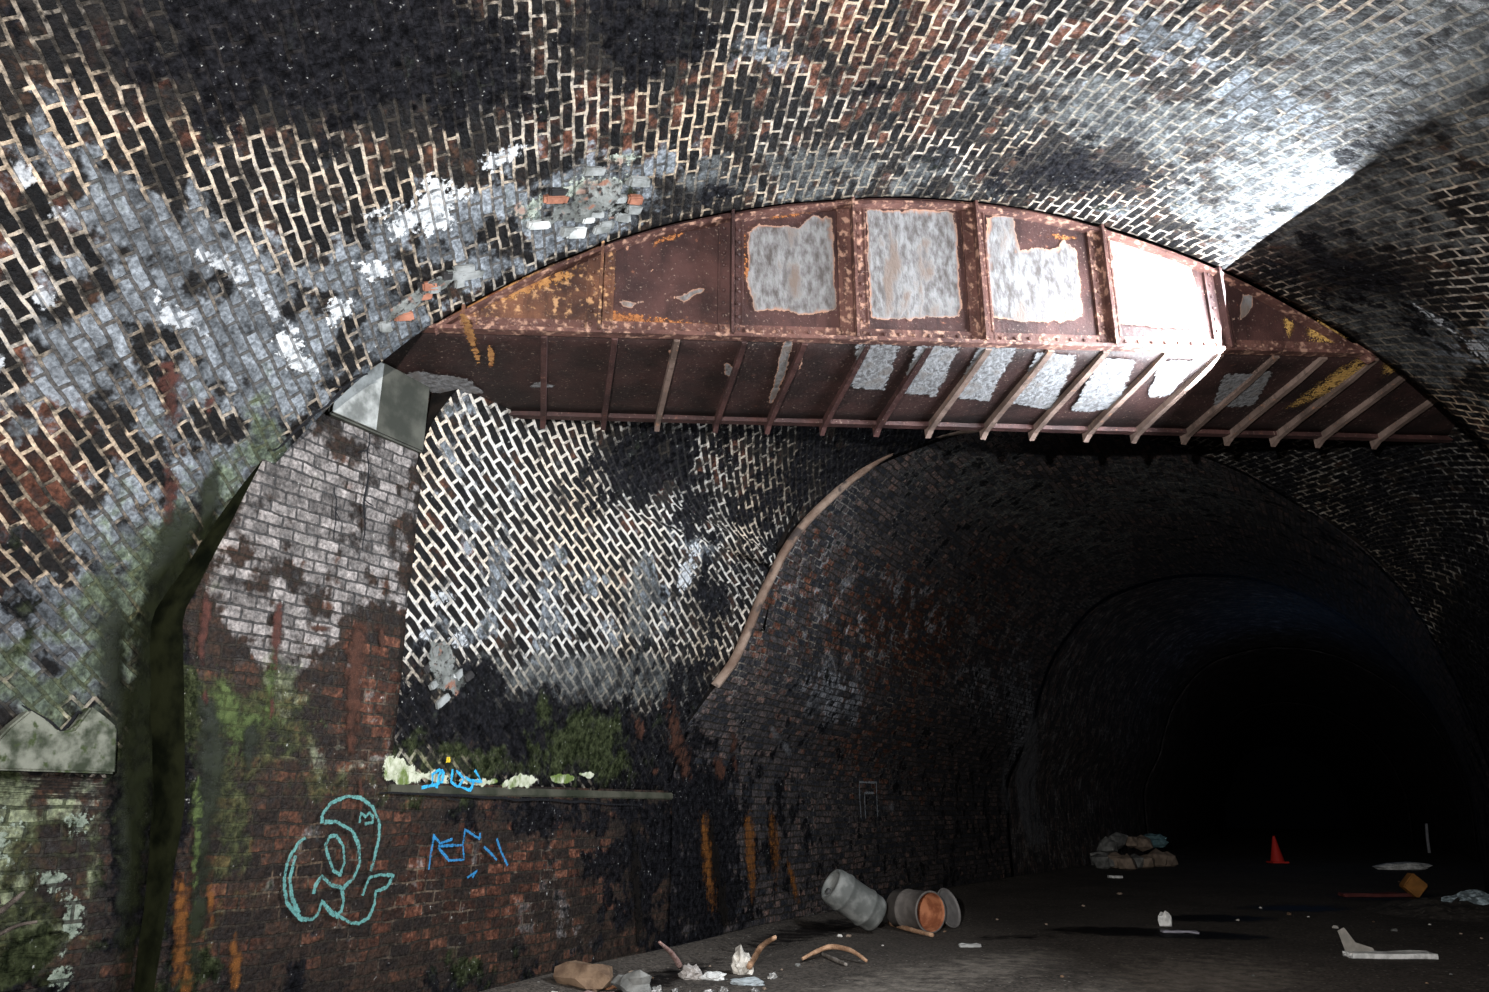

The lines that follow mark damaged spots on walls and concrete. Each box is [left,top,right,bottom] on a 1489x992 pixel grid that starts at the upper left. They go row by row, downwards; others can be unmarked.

efflorescence [481,144,527,174]
efflorescence [365,172,473,240]
efflorescence [196,249,319,376]
efflorescence [326,297,353,328]
rust [454,267,576,368]
rust [613,311,706,324]
peeling [746,215,837,315]
peeling [865,209,962,322]
peeling [986,216,1083,324]
peeling [1110,240,1206,329]
rust [1283,318,1347,343]
rust [1286,356,1396,409]